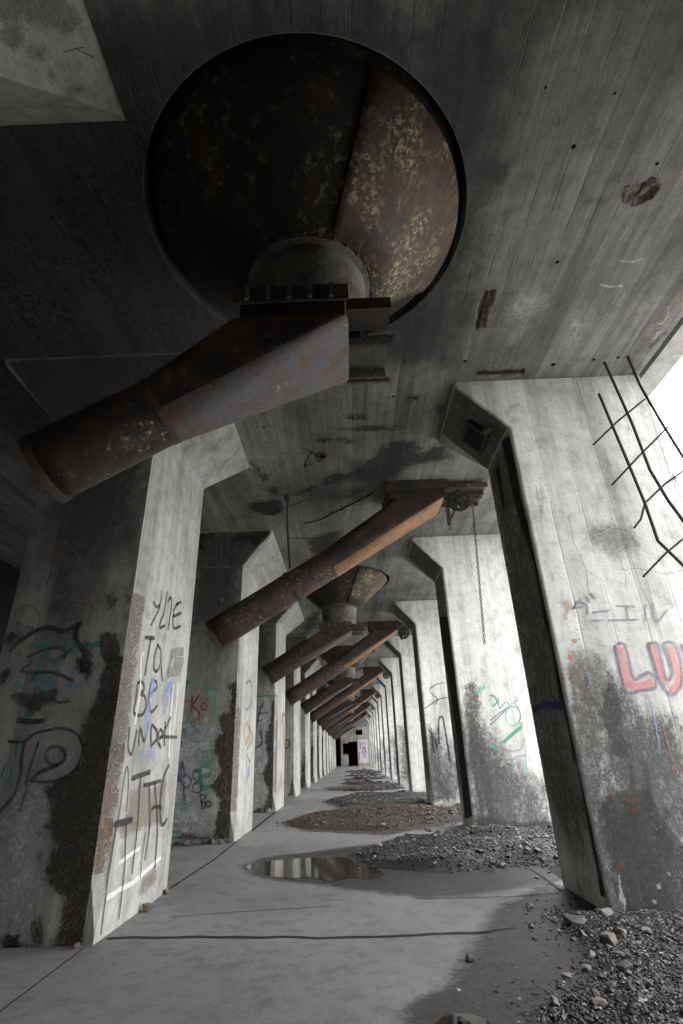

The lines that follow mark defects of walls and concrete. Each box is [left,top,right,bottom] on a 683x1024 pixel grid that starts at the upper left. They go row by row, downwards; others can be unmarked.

spalling [617,173,663,209]
leakage [99,632,120,664]
leakage [244,437,683,1024]